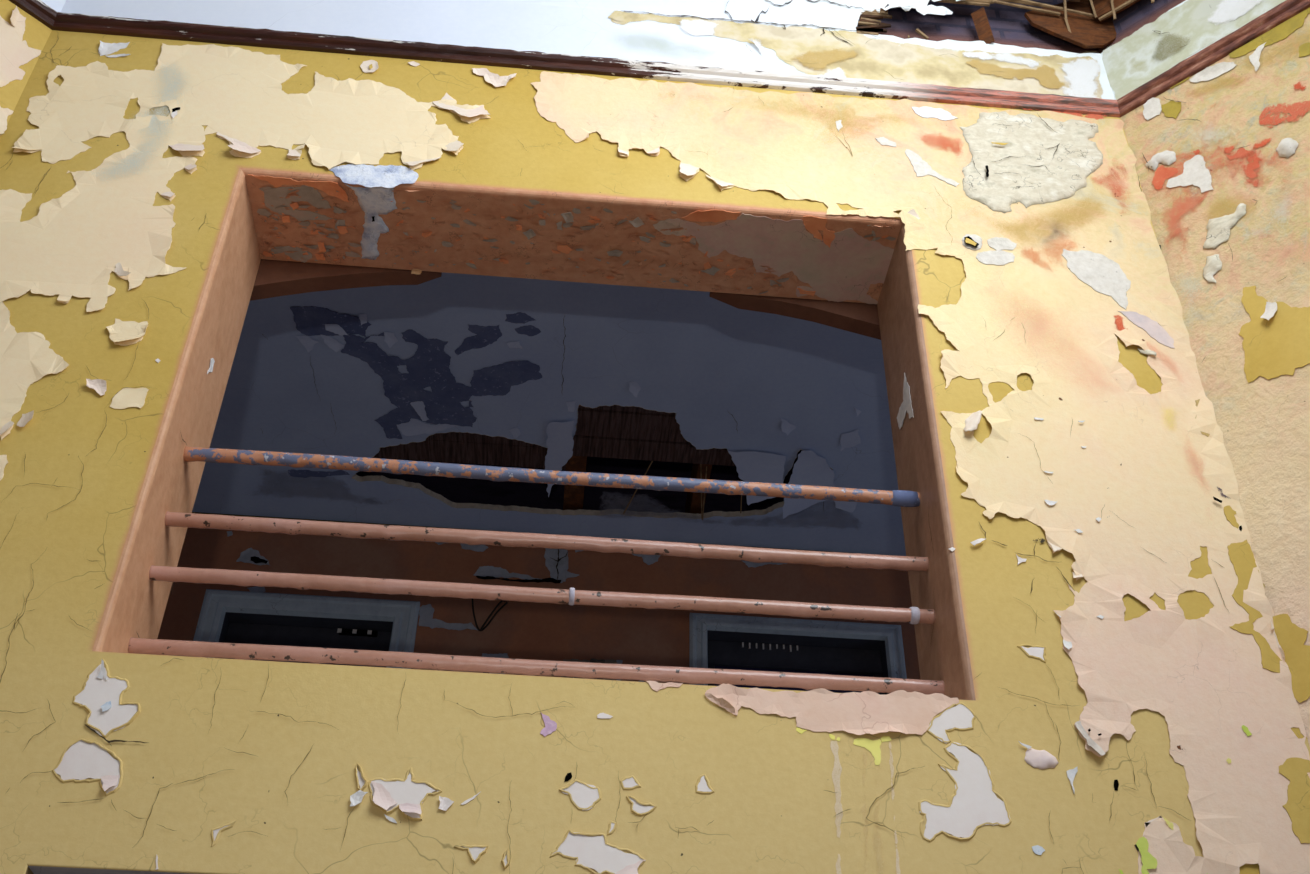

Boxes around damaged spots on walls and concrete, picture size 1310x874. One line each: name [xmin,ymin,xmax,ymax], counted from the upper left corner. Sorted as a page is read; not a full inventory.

peeling [0,6,41,87]
crack [621,0,880,64]
damp [791,48,858,71]
flaking render [611,0,1286,100]
peeling [0,41,491,481]
peeling [290,306,542,439]
peeling [530,71,1310,874]
crack [0,301,151,793]
peeling [52,659,141,796]
crack [58,670,339,842]
crack [824,766,924,835]
crack [1049,743,1191,874]